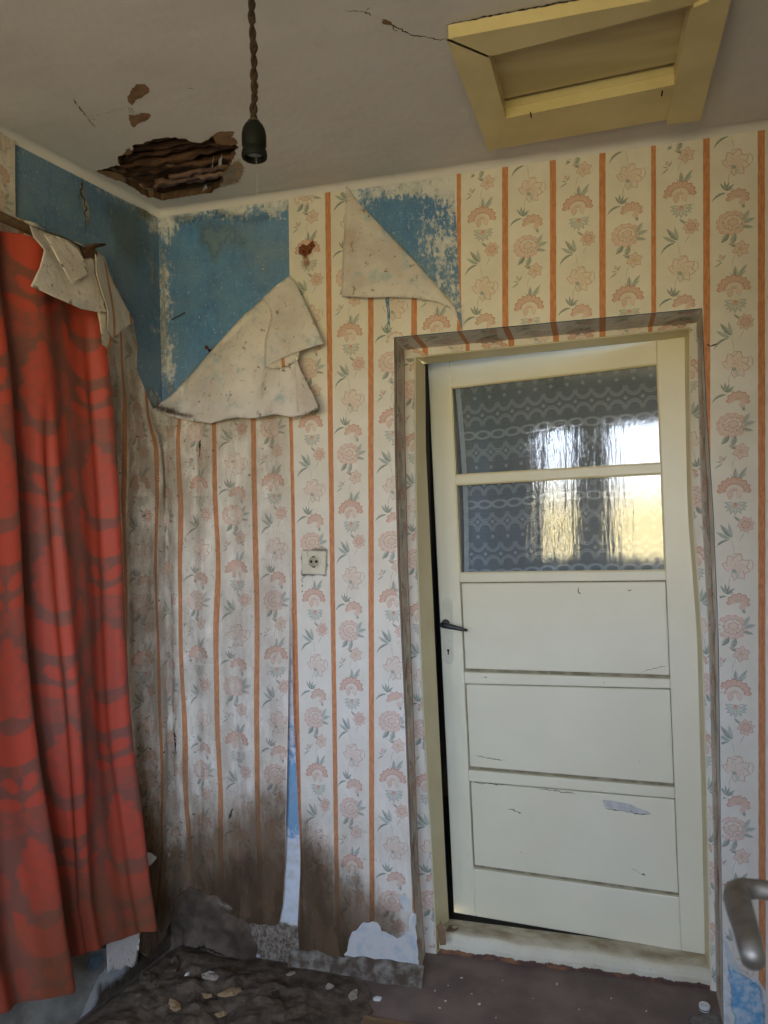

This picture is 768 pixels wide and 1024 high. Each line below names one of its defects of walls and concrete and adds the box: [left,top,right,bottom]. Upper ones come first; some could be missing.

crack [345,0,578,41]
peeling [127,84,151,128]
spalling [98,131,238,201]
corrosion [299,241,315,265]
water stain [94,791,399,1009]
spalling [288,895,424,988]